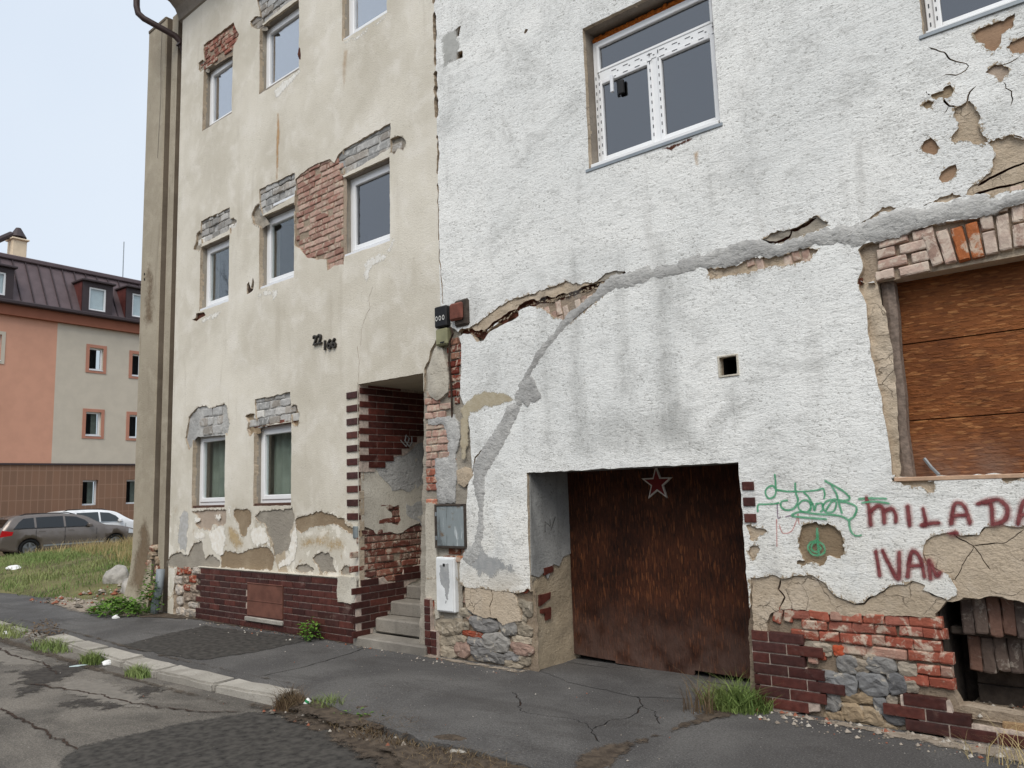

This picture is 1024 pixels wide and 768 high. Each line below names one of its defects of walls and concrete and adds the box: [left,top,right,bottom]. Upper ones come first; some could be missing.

peeling [972,14,1024,82]
spalling [920,82,1024,198]
spalling [251,125,406,269]
crack [766,221,813,244]
flaking render [858,226,958,285]
flaking render [980,204,1024,256]
crack [461,271,626,339]
spalling [419,328,539,672]
peeling [142,506,362,617]
spalling [746,519,1024,736]
crack [0,648,238,712]
crack [0,708,78,749]